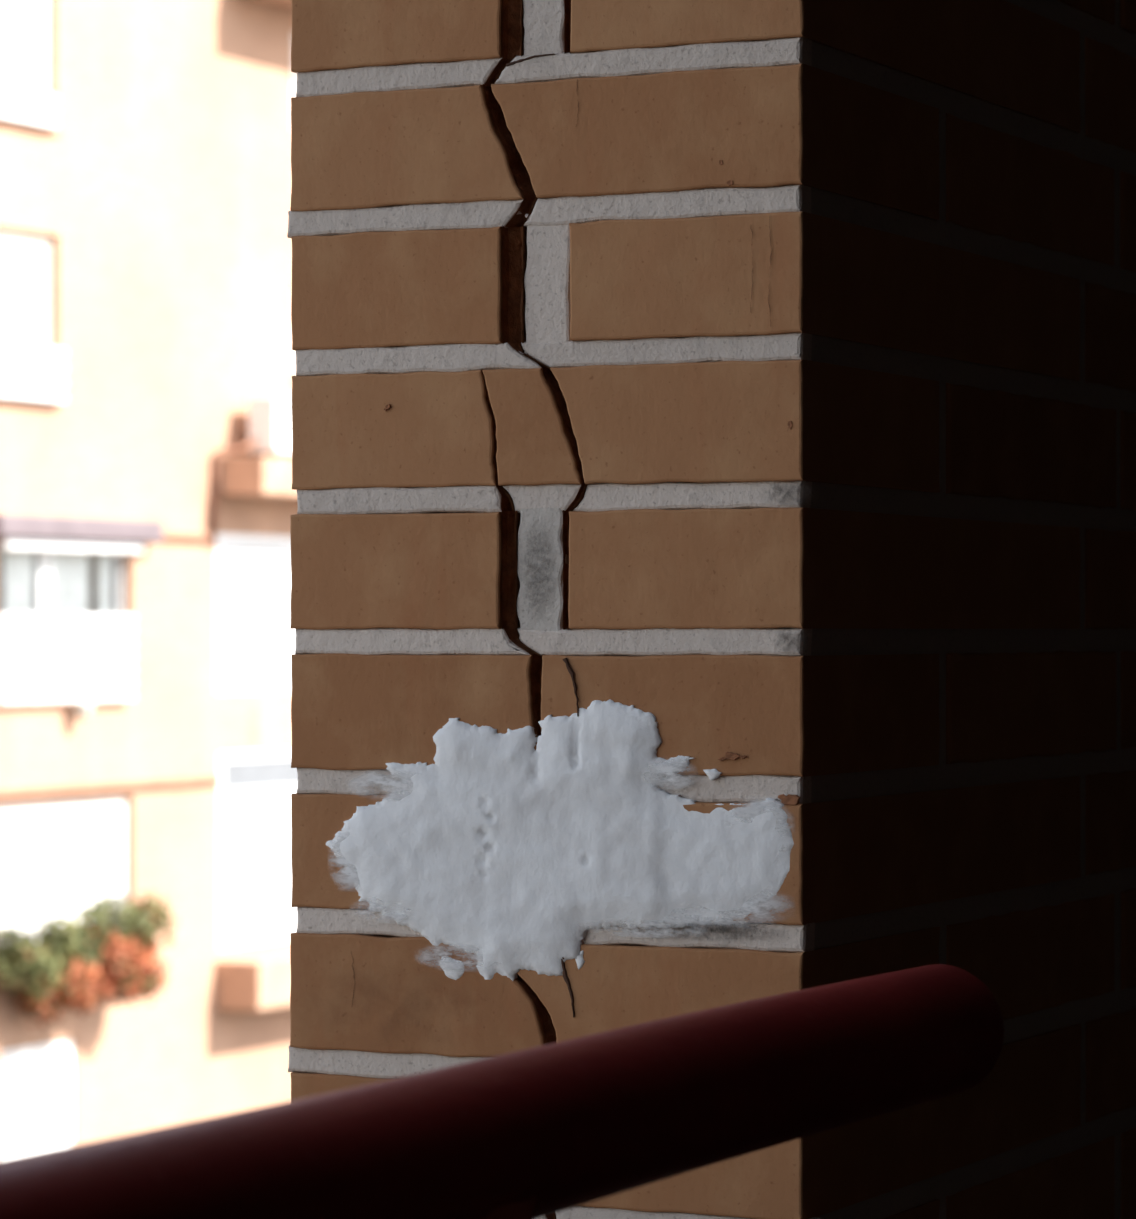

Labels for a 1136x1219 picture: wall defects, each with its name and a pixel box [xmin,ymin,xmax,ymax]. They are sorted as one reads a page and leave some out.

crack [481,0,588,737]
crack [515,957,575,1045]